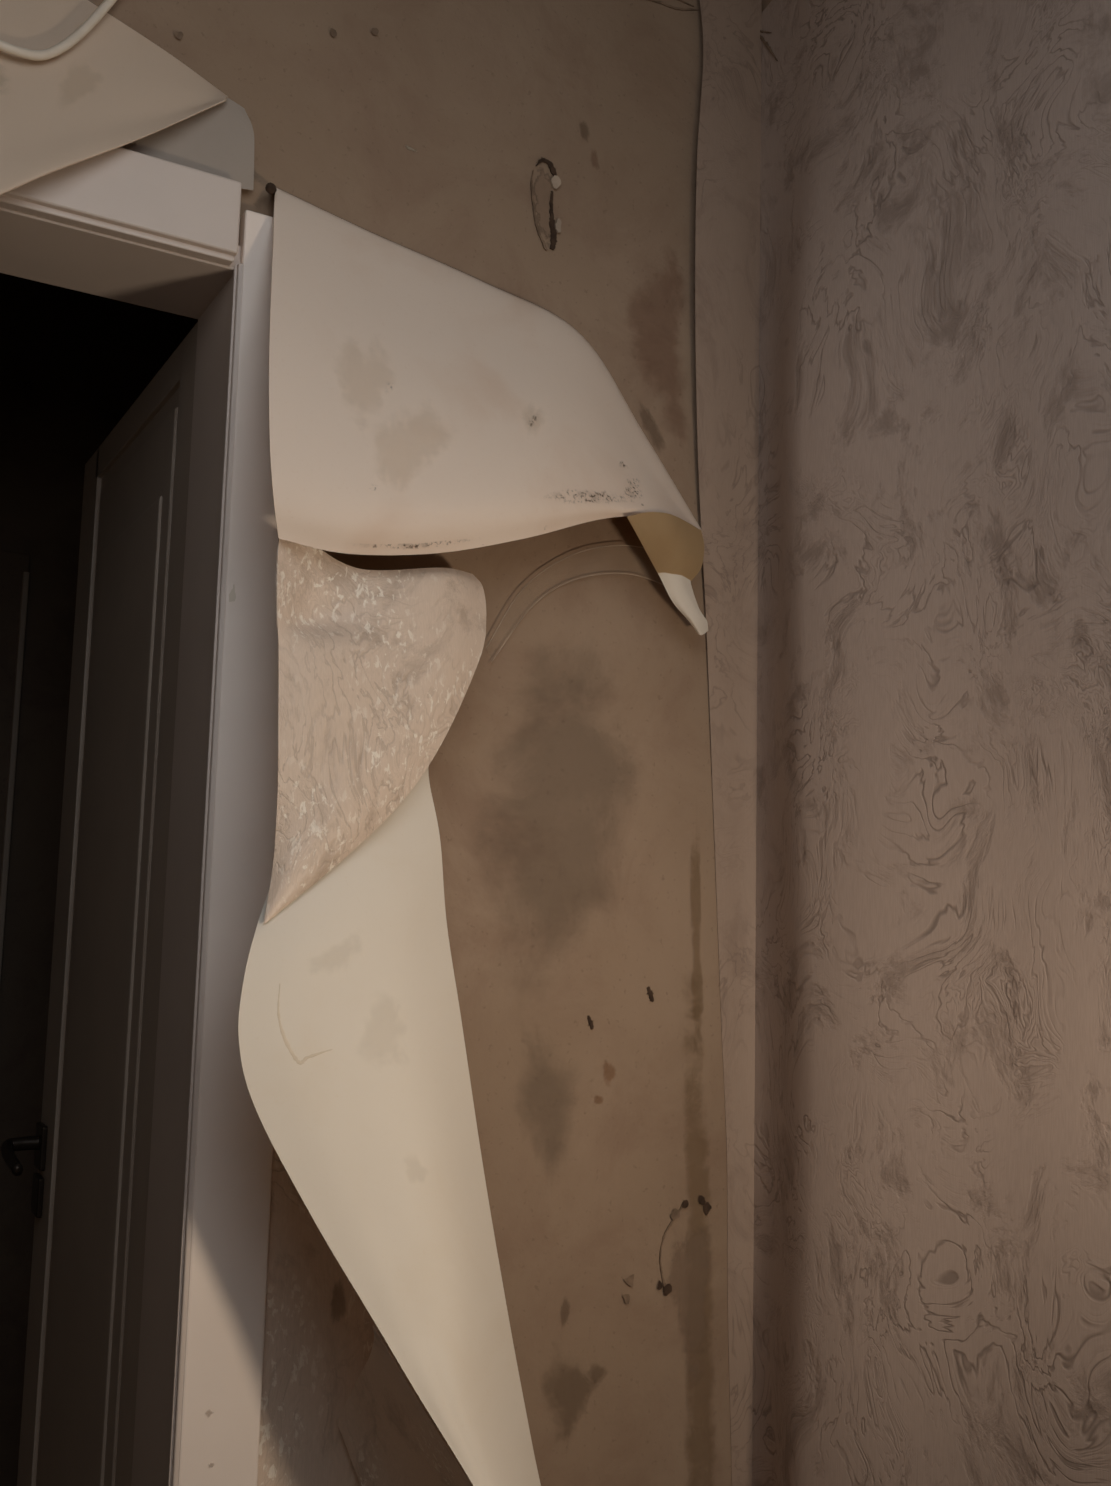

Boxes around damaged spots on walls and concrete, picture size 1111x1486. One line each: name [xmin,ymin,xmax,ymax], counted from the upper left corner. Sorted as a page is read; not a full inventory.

flaking render [530,158,561,250]
peeling [671,1195,712,1221]
peeling [657,1280,672,1296]